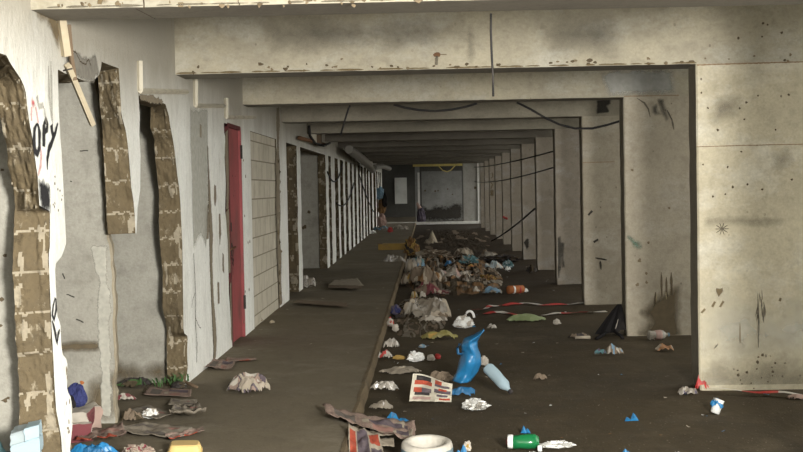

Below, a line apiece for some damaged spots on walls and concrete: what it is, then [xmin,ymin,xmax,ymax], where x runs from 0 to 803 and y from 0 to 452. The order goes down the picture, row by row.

spalling [0,56,72,452]
spalling [66,53,135,234]
spalling [140,94,188,385]
damp [645,272,679,335]